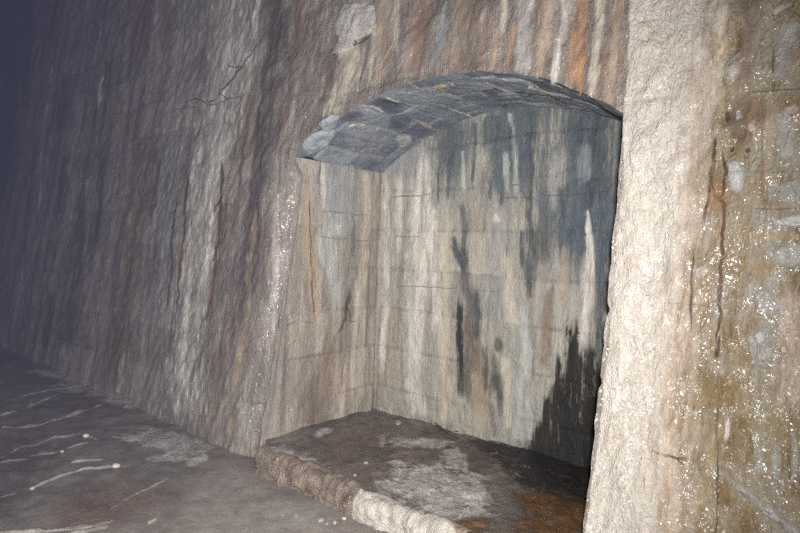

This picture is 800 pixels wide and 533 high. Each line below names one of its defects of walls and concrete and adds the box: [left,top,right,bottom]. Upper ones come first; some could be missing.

crack [190,45,257,103]
leakage [453,206,502,407]
leakage [469,0,706,533]